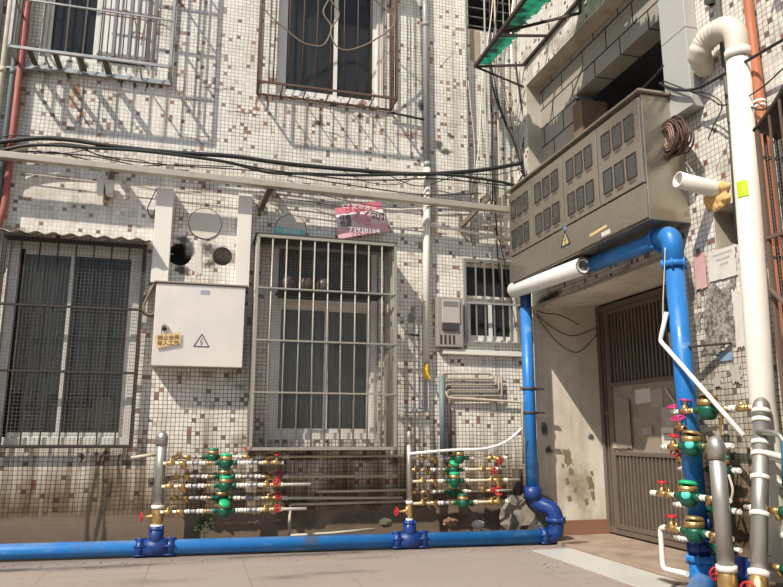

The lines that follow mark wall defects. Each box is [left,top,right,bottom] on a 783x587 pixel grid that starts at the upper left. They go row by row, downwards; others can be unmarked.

spalling [694,275,736,356]
spalling [712,362,742,388]
leakage [85,451,122,542]